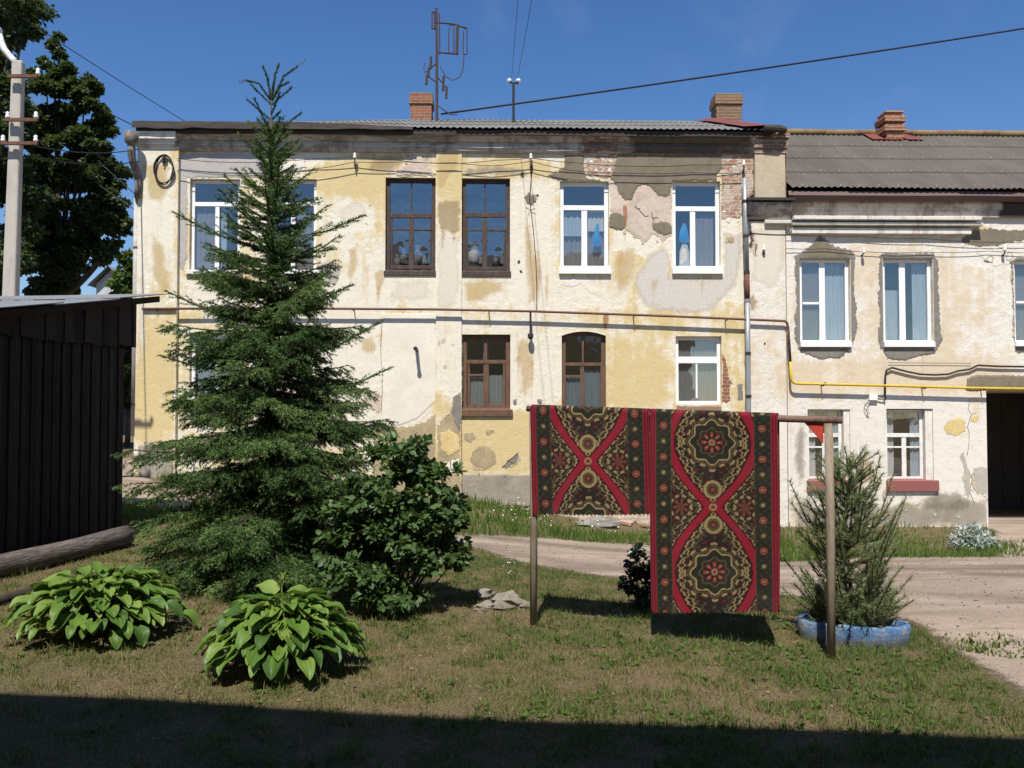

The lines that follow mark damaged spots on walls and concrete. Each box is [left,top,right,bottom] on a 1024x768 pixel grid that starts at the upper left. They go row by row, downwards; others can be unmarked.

flaking render [580,136,672,244]
flaking render [717,142,754,244]
flaking render [677,355,733,411]
flaking render [373,393,521,498]